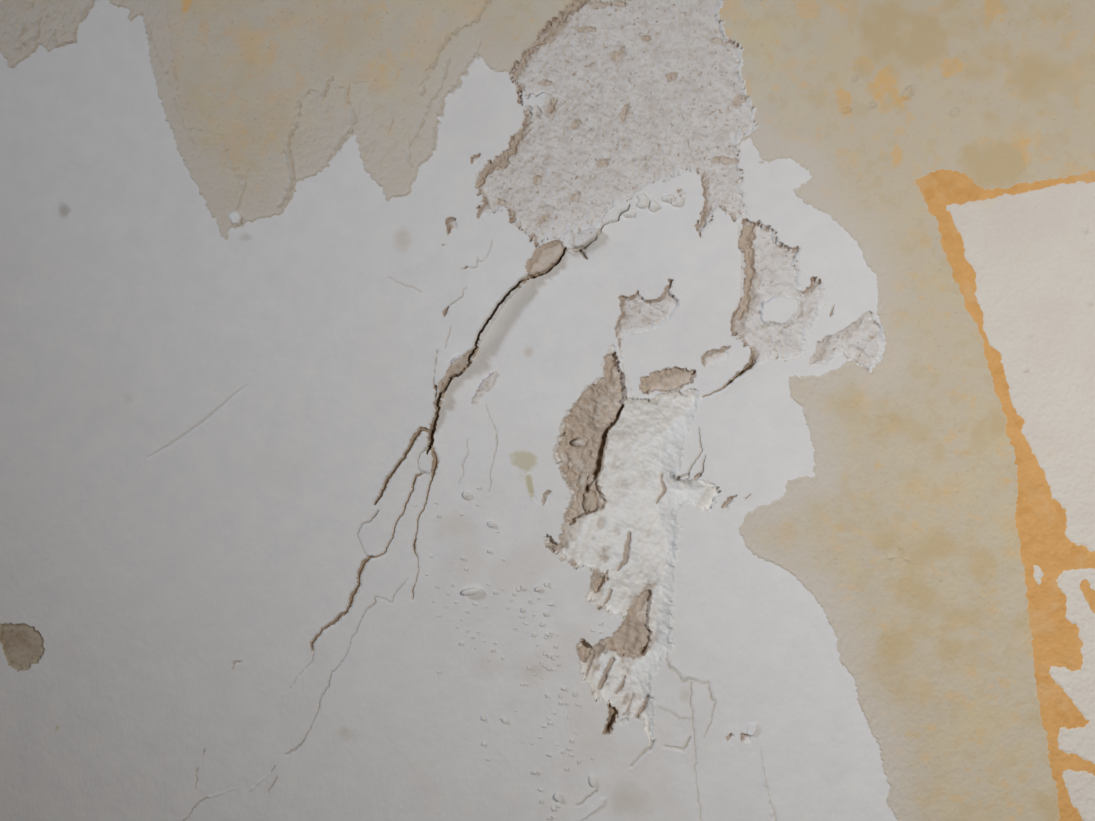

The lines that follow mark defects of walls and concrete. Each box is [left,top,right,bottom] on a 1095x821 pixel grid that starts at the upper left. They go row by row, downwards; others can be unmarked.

crack [268,205,631,793]
flaking render [471,0,887,746]